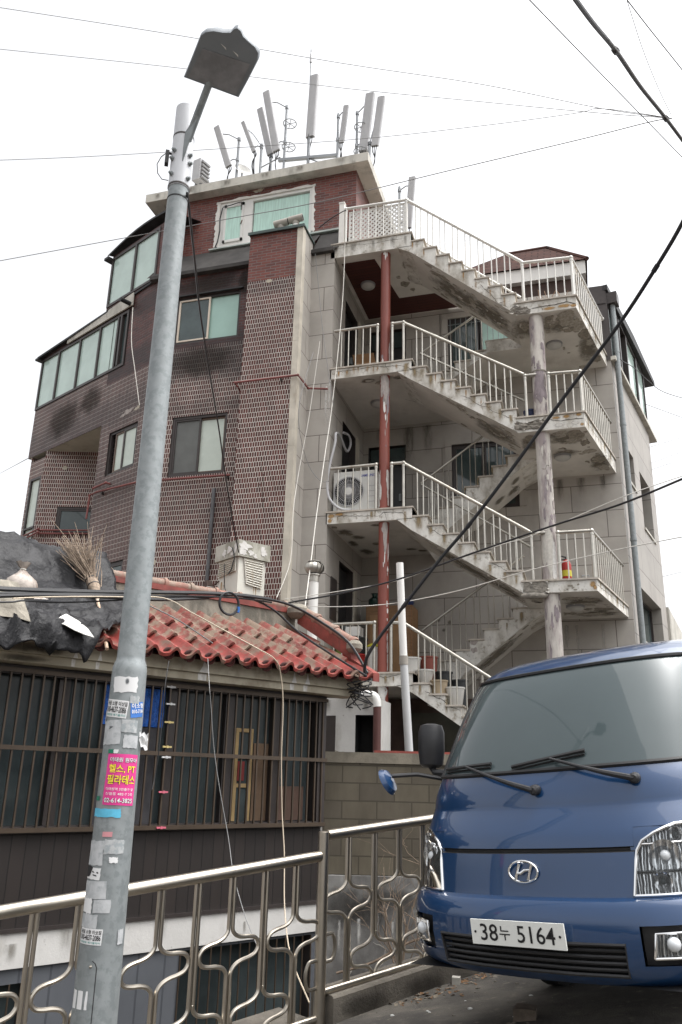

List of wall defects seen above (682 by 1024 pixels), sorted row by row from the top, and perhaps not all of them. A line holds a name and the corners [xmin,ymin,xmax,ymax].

water stain [438,278,530,338]
water stain [580,335,596,357]
peeling [418,263,616,631]
peeling [372,521,389,588]